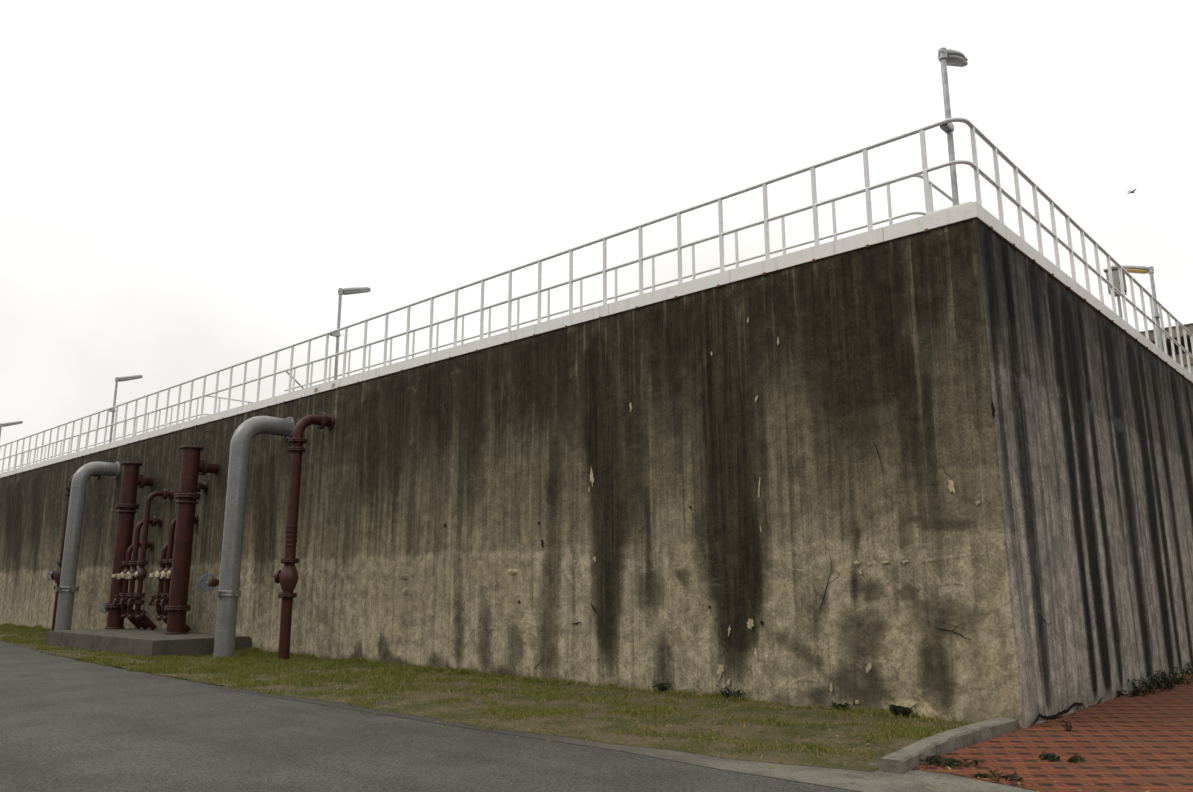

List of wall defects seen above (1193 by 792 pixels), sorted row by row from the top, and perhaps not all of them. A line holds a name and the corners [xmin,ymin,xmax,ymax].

leakage [584,334,627,667]
leakage [700,298,762,674]
crack [812,554,842,616]
leakage [378,635,407,666]
crack [1032,690,1125,726]